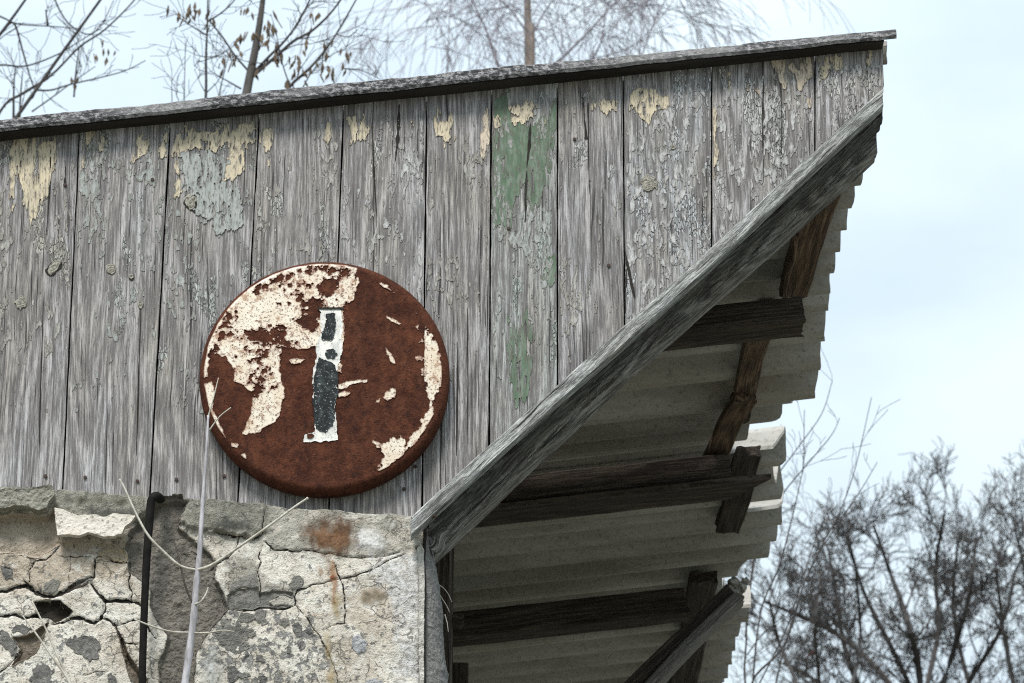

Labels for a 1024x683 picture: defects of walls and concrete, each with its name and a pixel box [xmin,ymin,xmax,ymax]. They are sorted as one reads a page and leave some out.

peeling [8,137,57,228]
peeling [130,121,273,235]
peeling [434,108,456,149]
peeling [480,93,556,230]
peeling [590,87,670,126]
peeling [771,54,843,108]
peeling [505,306,540,409]
crack [0,546,156,675]
spalling [0,493,313,683]
crack [212,511,427,683]
rust [303,516,356,603]